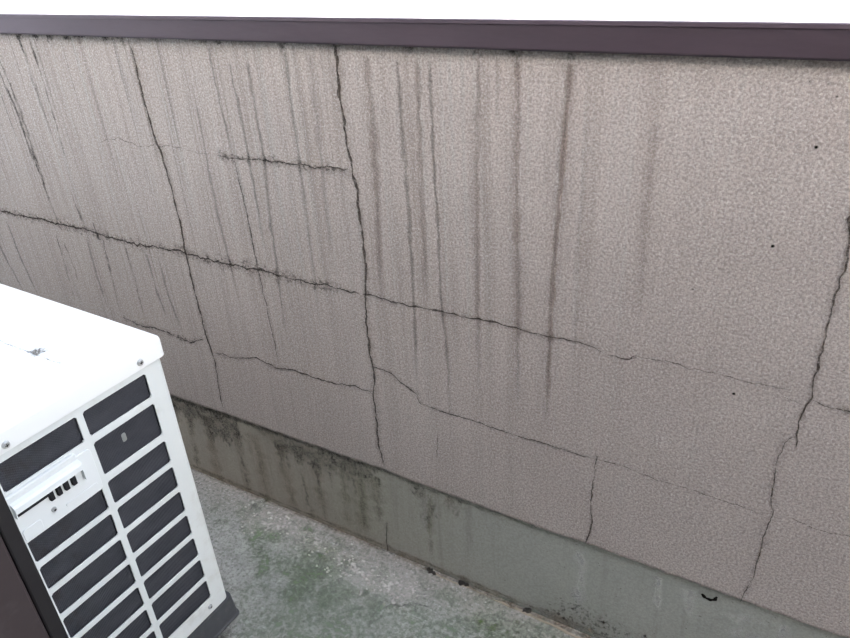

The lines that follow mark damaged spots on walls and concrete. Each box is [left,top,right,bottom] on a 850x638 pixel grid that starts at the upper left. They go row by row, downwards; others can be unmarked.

damp [170,396,265,445]
crack [1,46,779,540]
crack [741,216,850,600]